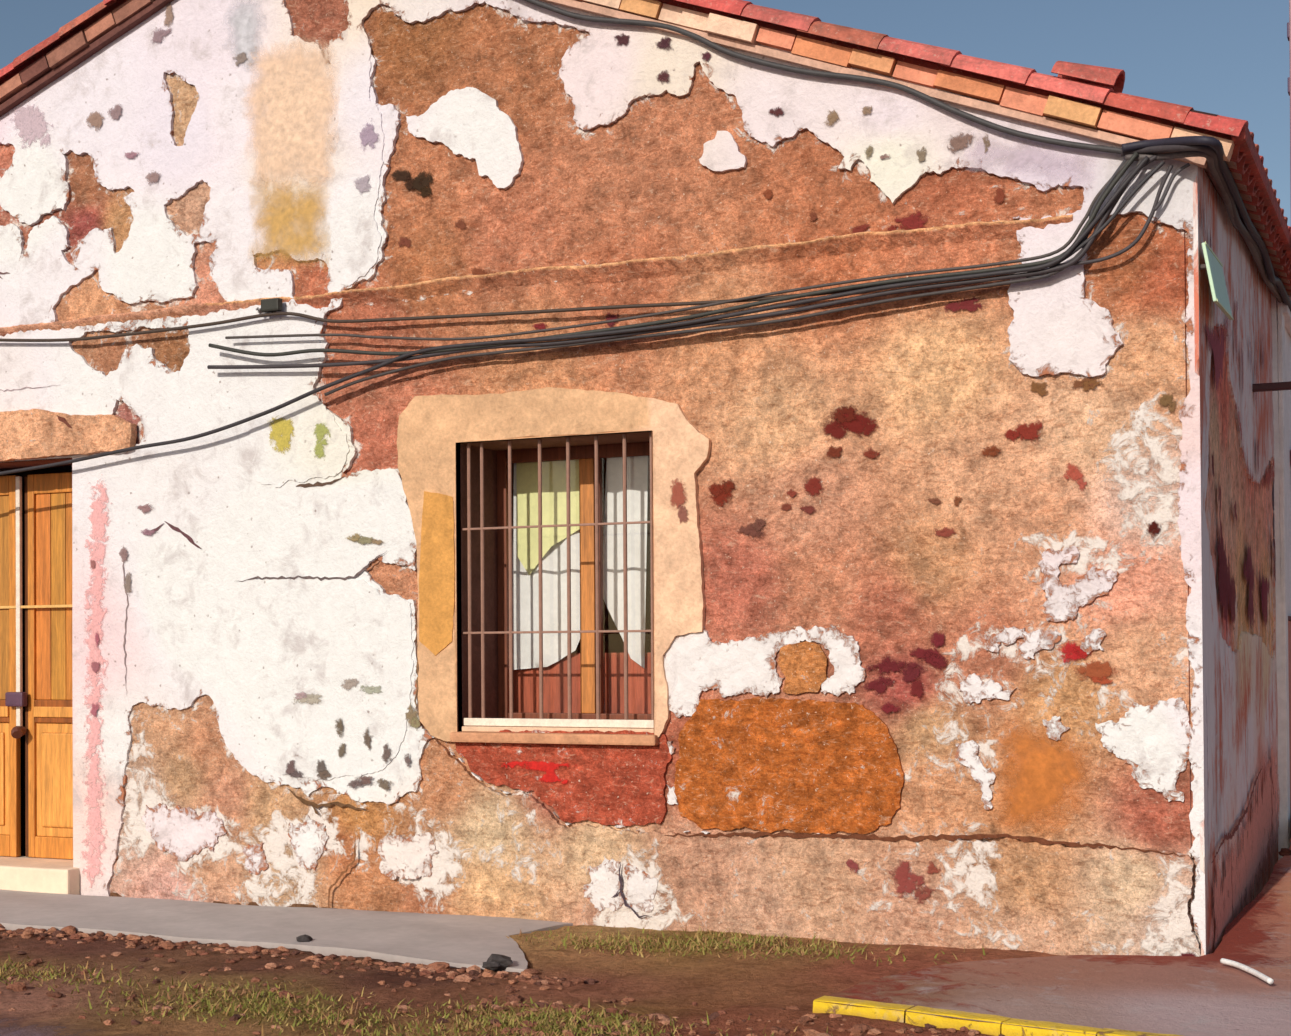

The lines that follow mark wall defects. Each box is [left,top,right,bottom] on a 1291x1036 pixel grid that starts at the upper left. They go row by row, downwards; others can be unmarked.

peeling [0,144,15,179]
peeling [0,151,134,266]
spalling [86,104,122,131]
peeling [55,181,227,375]
crack [240,553,384,582]
peeling [109,0,1201,956]
water stain [1205,302,1275,491]
water stain [1212,452,1276,630]
crack [667,766,1274,915]
water stain [1211,743,1280,950]